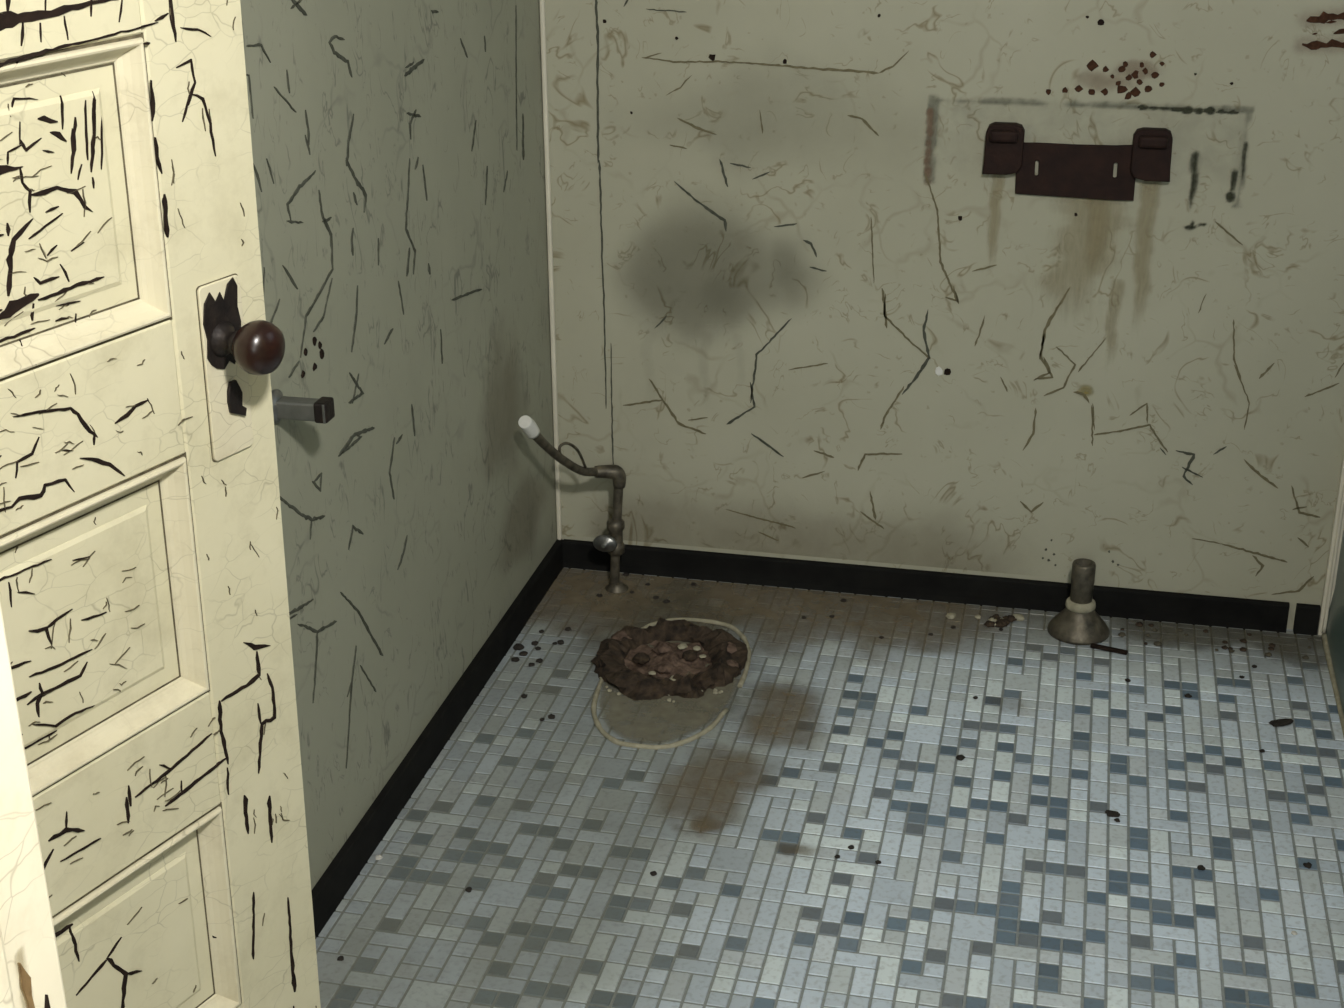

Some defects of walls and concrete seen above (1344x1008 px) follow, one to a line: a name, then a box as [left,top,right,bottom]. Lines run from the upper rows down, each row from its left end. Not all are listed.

crack [460,6,525,205]
rust [1046,51,1165,99]
crack [595,0,996,529]
crack [1215,221,1243,245]
crack [440,289,482,364]
crack [1305,363,1344,397]
crack [1000,287,1320,595]
crack [397,535,408,570]
crack [726,509,795,541]
leakage [602,677,738,743]
leakage [749,688,811,743]
leakage [666,756,757,831]